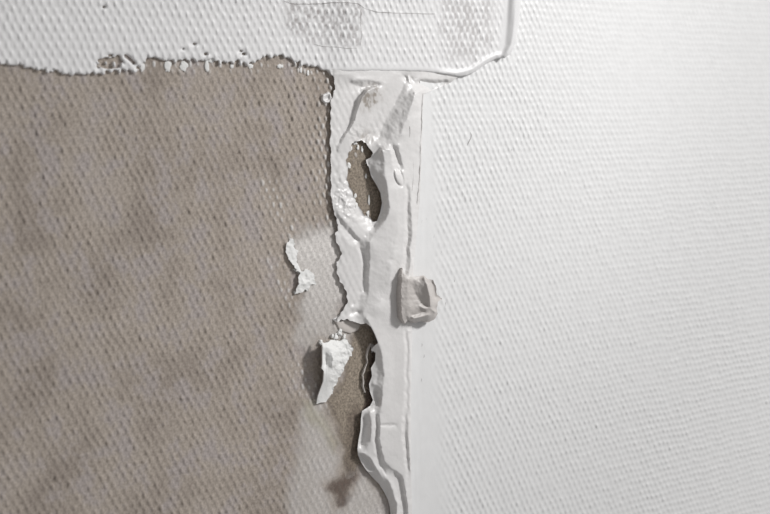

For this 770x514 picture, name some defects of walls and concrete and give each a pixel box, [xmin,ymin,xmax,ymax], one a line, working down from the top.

peeling [346,141,382,221]
peeling [286,238,316,294]
peeling [316,326,377,471]